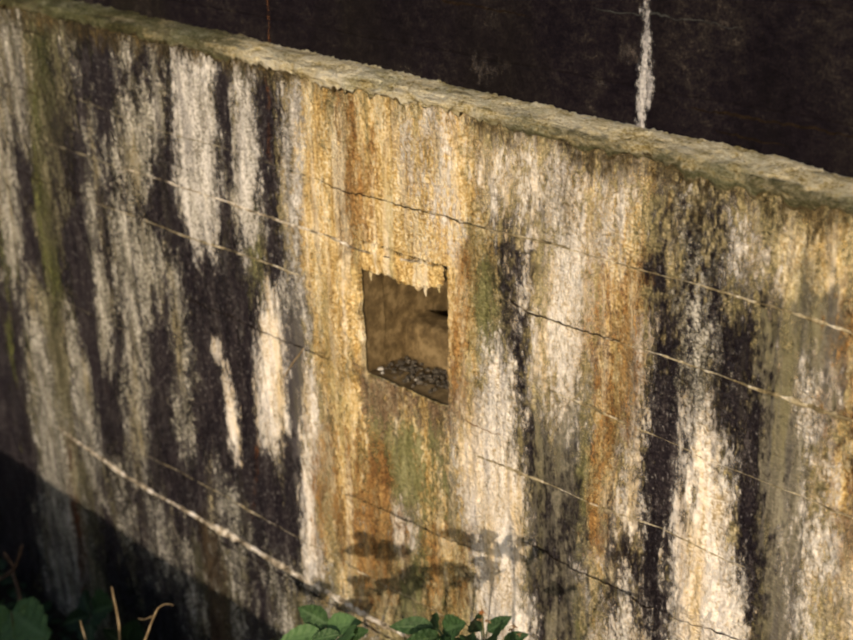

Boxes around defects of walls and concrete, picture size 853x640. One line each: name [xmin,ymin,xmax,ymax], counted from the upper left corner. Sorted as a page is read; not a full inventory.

damp [636,0,655,128]
corrosion [334,89,378,266]
damp [0,7,277,640]
corrosion [310,405,412,621]
damp [252,70,853,640]
corrosion [583,263,645,547]
crack [524,542,738,640]